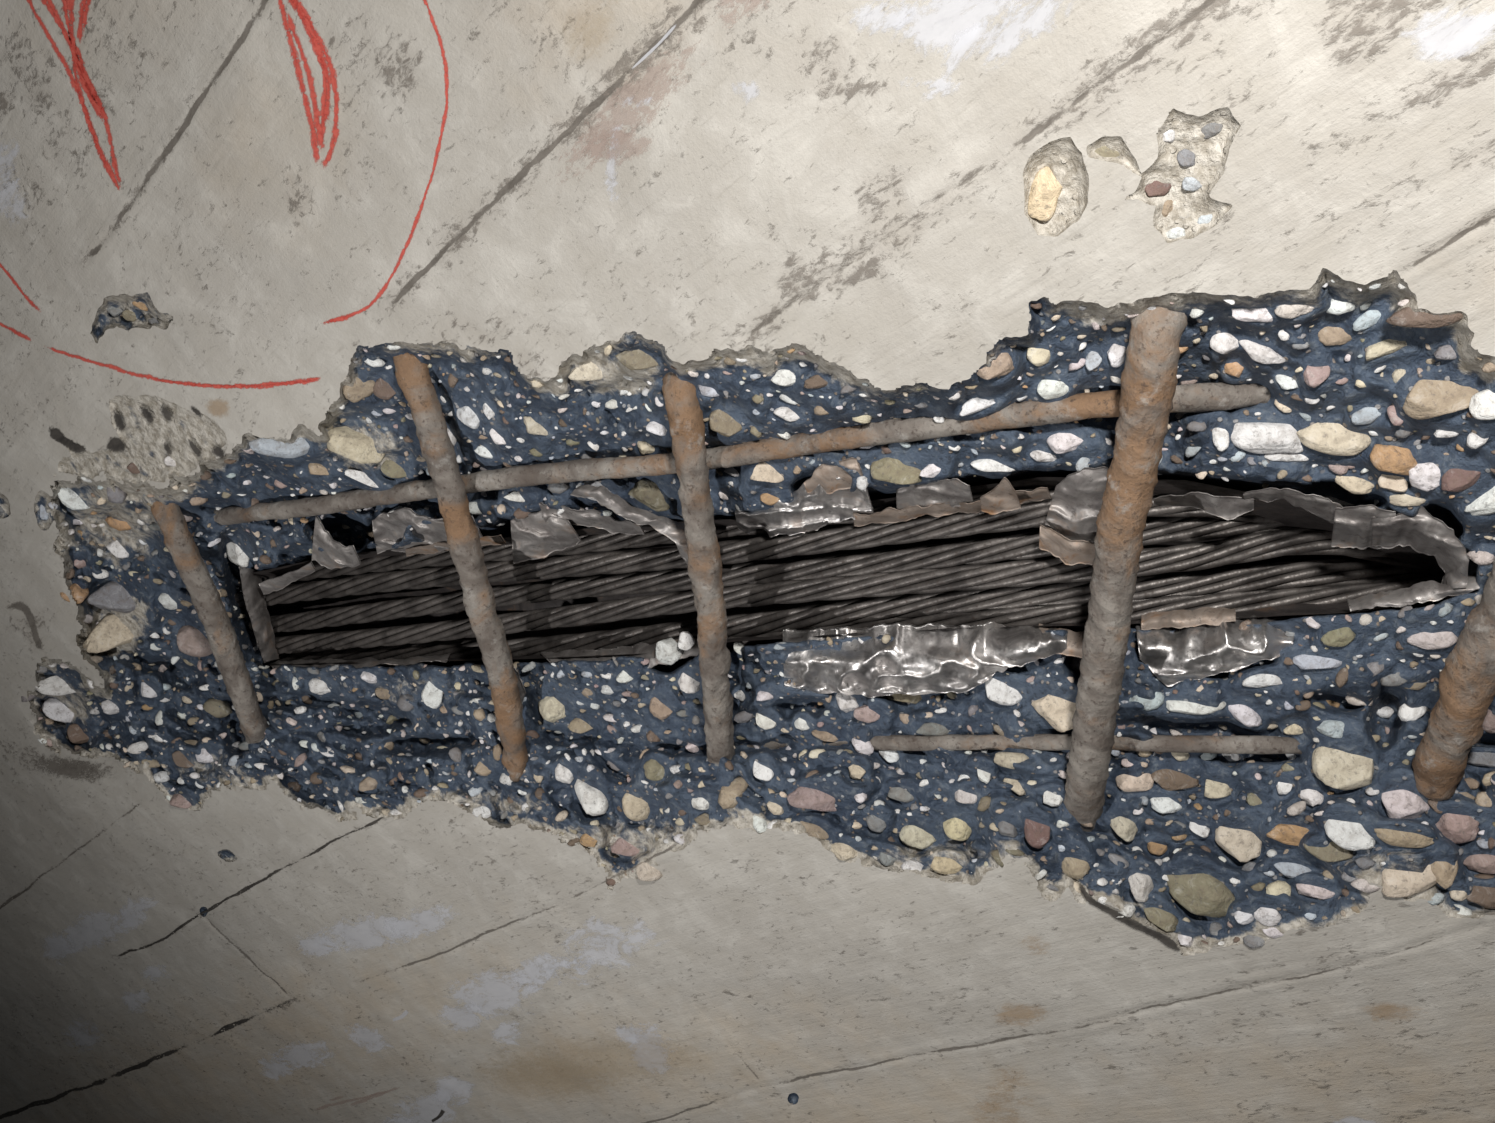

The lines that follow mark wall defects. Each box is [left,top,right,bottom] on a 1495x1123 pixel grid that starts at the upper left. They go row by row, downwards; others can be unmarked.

crack [90,0,268,255]
crack [394,0,703,303]
spalling [8,268,1495,956]
crack [0,804,383,1119]
crack [402,845,676,967]
crack [646,1102,712,1123]
crack [747,988,1241,1082]
crack [1287,969,1334,980]